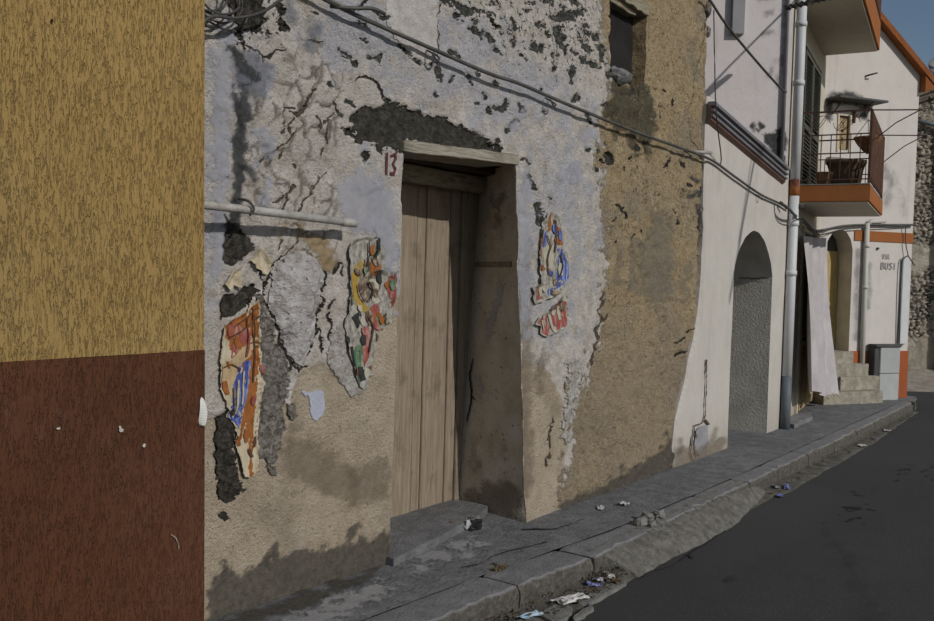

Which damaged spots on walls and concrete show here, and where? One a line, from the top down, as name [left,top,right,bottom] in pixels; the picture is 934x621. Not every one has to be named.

peeling [440,0,612,103]
flaking render [342,91,527,162]
leakage [603,104,652,159]
flaking render [222,221,255,265]
crack [258,88,344,372]
flaking render [220,283,298,478]
crack [466,359,475,422]
peeling [559,357,586,444]
flaking render [214,411,246,521]
leakage [207,524,391,621]